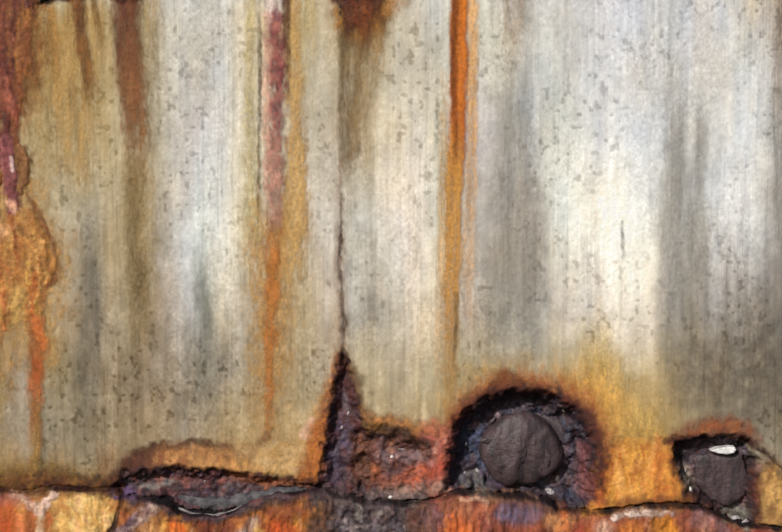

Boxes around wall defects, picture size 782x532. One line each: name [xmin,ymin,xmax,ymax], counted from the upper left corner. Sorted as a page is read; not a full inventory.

crack [255,31,263,201]
corrosion [333,0,398,166]
corrosion [438,0,478,356]
corrosion [0,0,327,532]
crack [337,276,349,367]
crack [48,484,94,492]
crack [147,495,238,517]
spalling [108,353,613,532]
crack [384,498,414,507]
crack [447,488,782,532]
spalling [663,417,765,529]
crack [750,447,782,469]